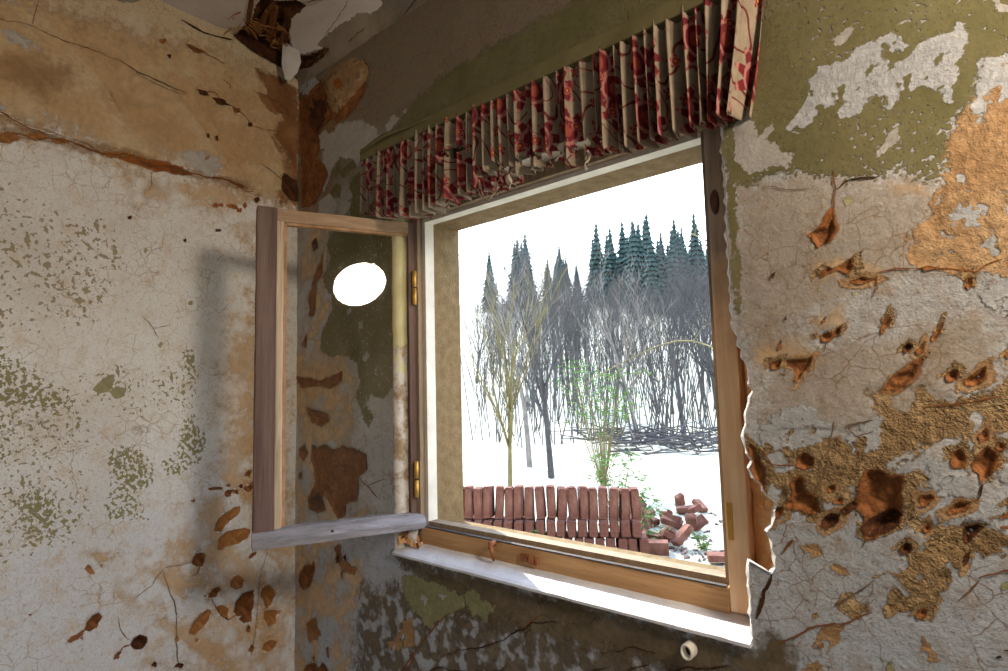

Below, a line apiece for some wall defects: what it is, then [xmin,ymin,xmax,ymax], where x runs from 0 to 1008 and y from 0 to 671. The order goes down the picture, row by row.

crack [1,1,280,132]
peeling [163,0,670,221]
peeling [721,0,1008,315]
crack [872,259,1002,297]
peeling [296,230,393,432]
peeling [0,182,206,577]
spalling [298,444,385,519]
spalling [174,575,281,652]
crack [401,613,558,671]
crack [755,574,772,619]
crack [770,581,874,646]
crack [958,570,1008,601]